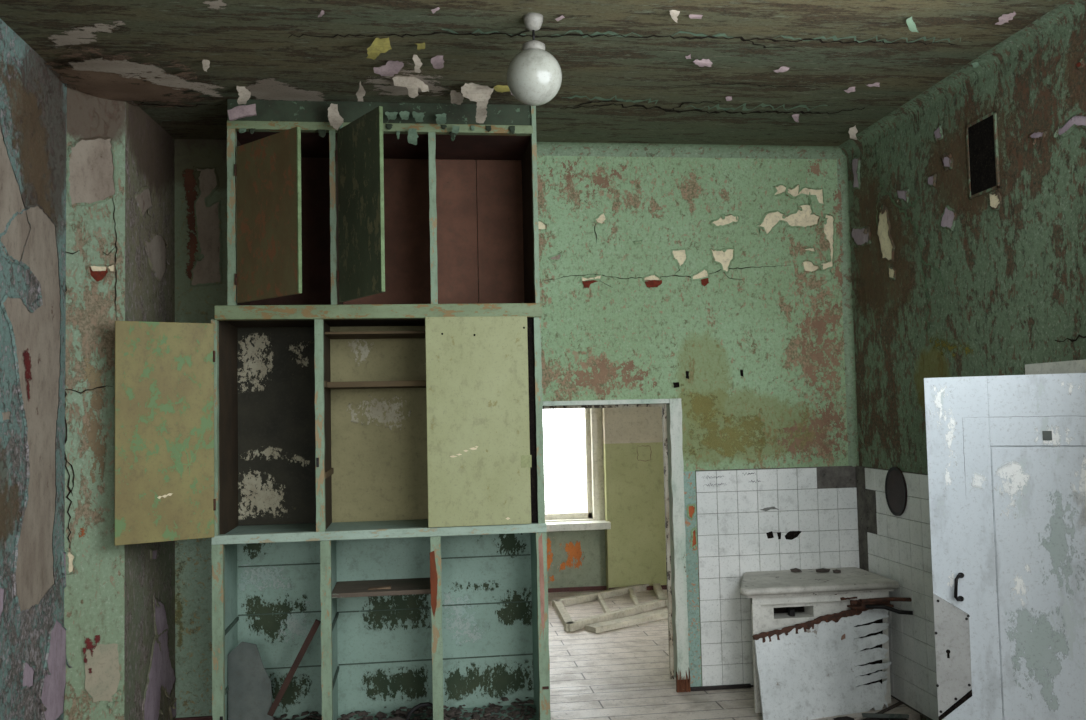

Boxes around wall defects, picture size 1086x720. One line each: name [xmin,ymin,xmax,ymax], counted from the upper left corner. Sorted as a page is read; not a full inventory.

flaking render [48,21,125,48]
flaking render [69,58,343,130]
flaking render [356,37,512,145]
crack [560,83,864,115]
flaking render [66,136,117,207]
water stain [922,96,1020,232]
crack [545,265,786,287]
peeling [754,157,910,463]
water stain [848,146,923,329]
flaking render [0,119,77,619]
water stain [681,384,766,463]
flaking render [19,617,72,720]